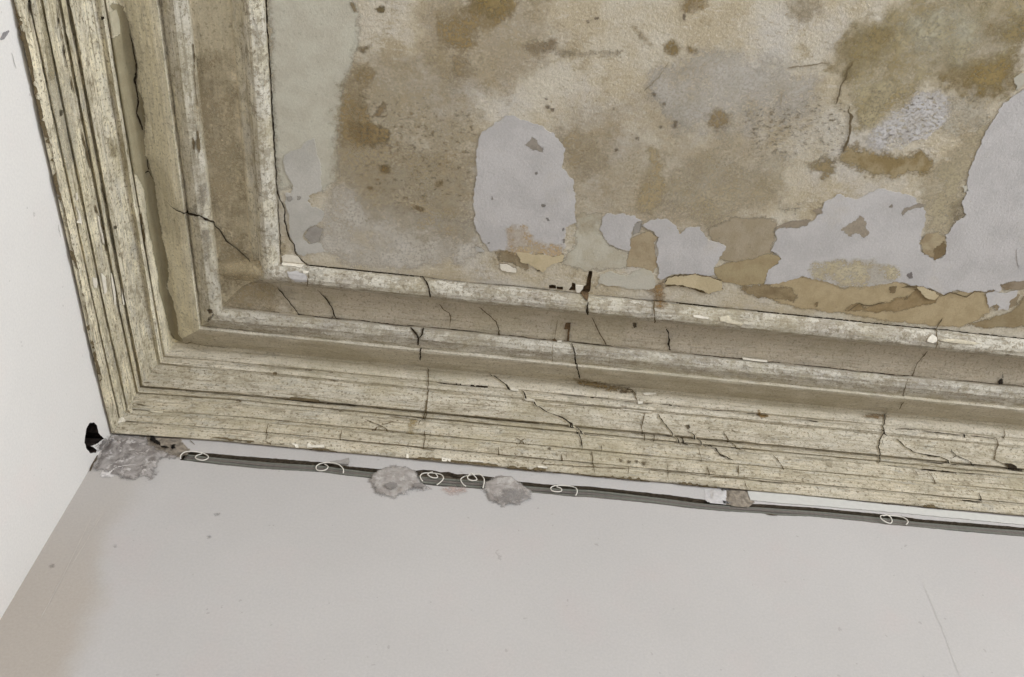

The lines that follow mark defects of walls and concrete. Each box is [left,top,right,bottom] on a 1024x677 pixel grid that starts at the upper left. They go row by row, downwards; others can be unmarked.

crack [171,206,250,262]
water stain [268,0,481,269]
peeling [358,95,577,273]
water stain [422,0,575,91]
crack [247,0,1024,487]
peeling [576,213,726,302]
peeling [693,315,744,326]
water stain [650,40,815,130]
spalling [749,97,844,156]
water stain [638,147,1024,329]
peeling [764,73,1024,311]
water stain [810,0,1024,234]